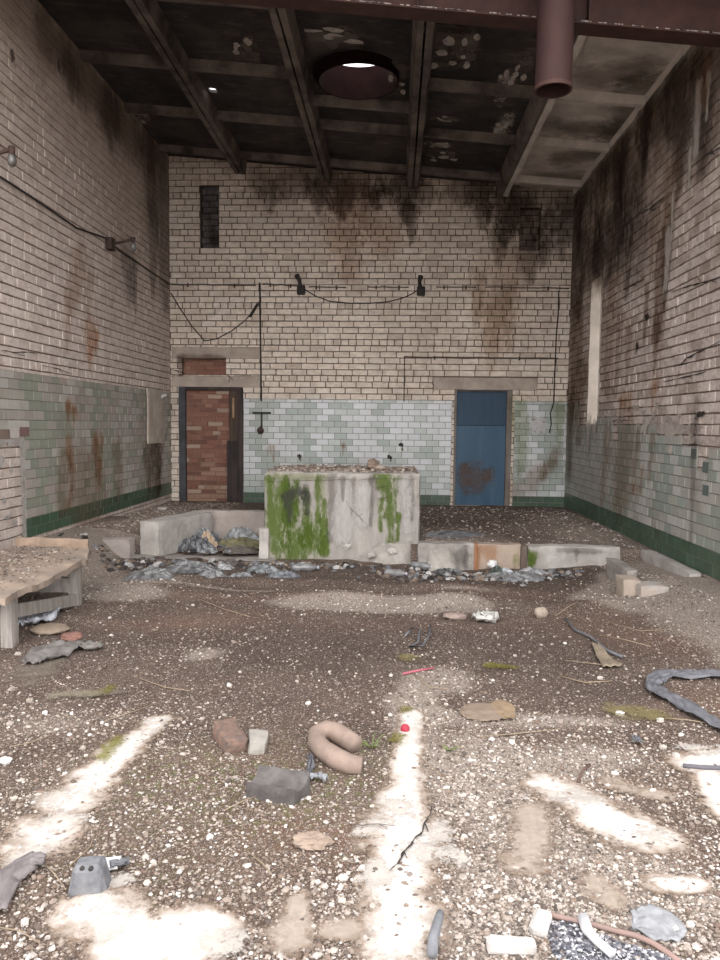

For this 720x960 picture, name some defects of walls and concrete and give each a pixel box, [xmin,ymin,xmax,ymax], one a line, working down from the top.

peeling [232,34,261,63]
peeling [300,26,363,51]
peeling [421,25,481,69]
peeling [498,49,536,85]
damp [688,70,711,191]
damp [663,191,674,295]
damp [281,475,414,557]
crack [351,806,432,870]